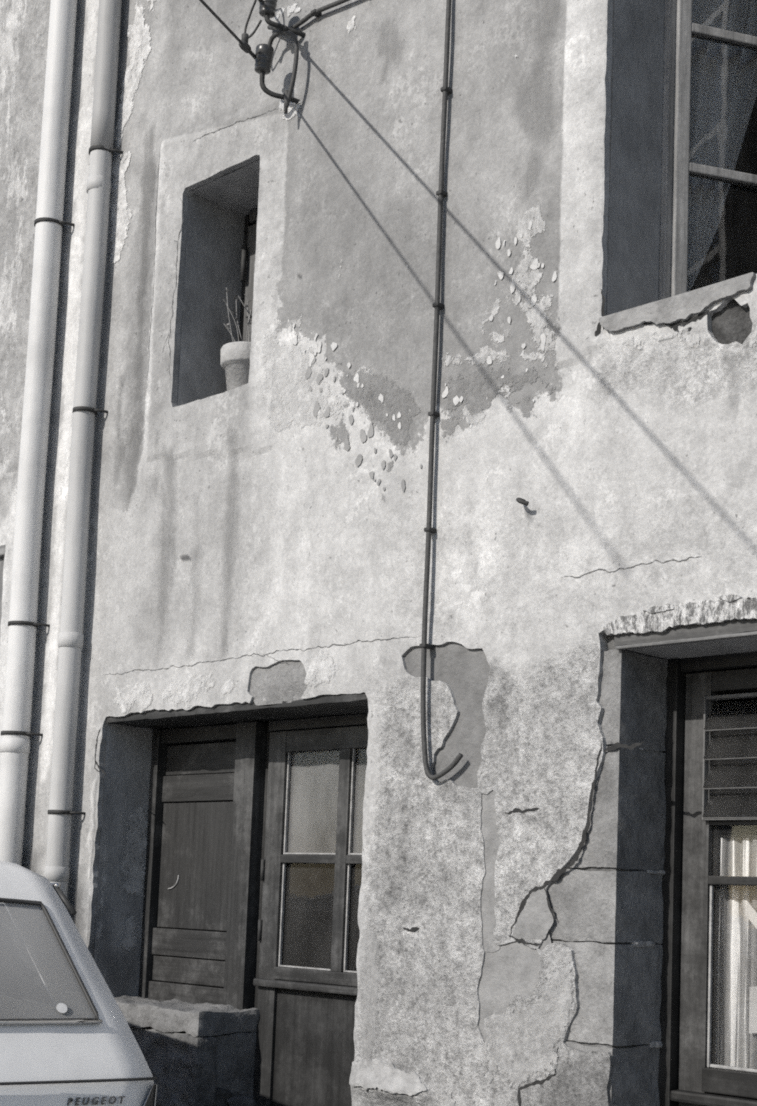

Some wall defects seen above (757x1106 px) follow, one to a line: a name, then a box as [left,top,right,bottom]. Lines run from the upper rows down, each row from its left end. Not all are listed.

peeling [109,0,155,265]
peeling [440,205,557,443]
flaking render [712,300,757,350]
peeling [261,316,421,491]
crack [570,556,701,578]
flaking render [603,594,757,636]
peeling [114,673,234,713]
flaking render [249,650,335,706]
flaking render [404,642,500,952]
flaking render [512,887,554,939]
crack [517,1047,559,1106]